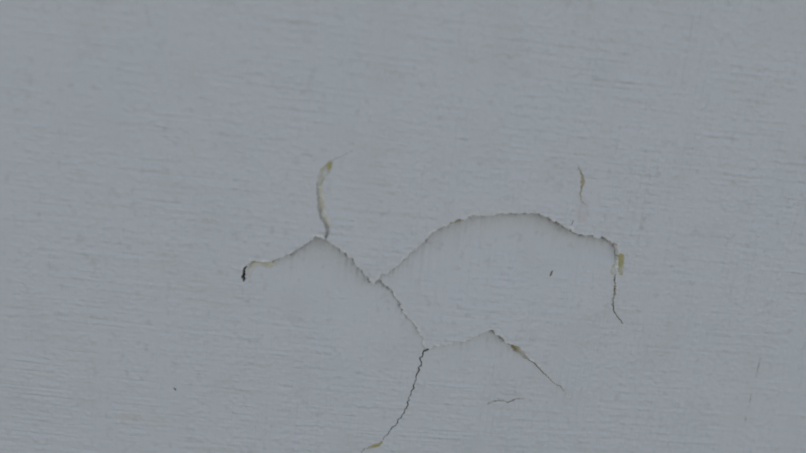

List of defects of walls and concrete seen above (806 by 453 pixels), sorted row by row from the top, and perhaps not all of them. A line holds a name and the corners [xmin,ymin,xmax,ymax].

crack [316,151,352,239]
peeling [240,210,625,350]
crack [363,349,428,451]